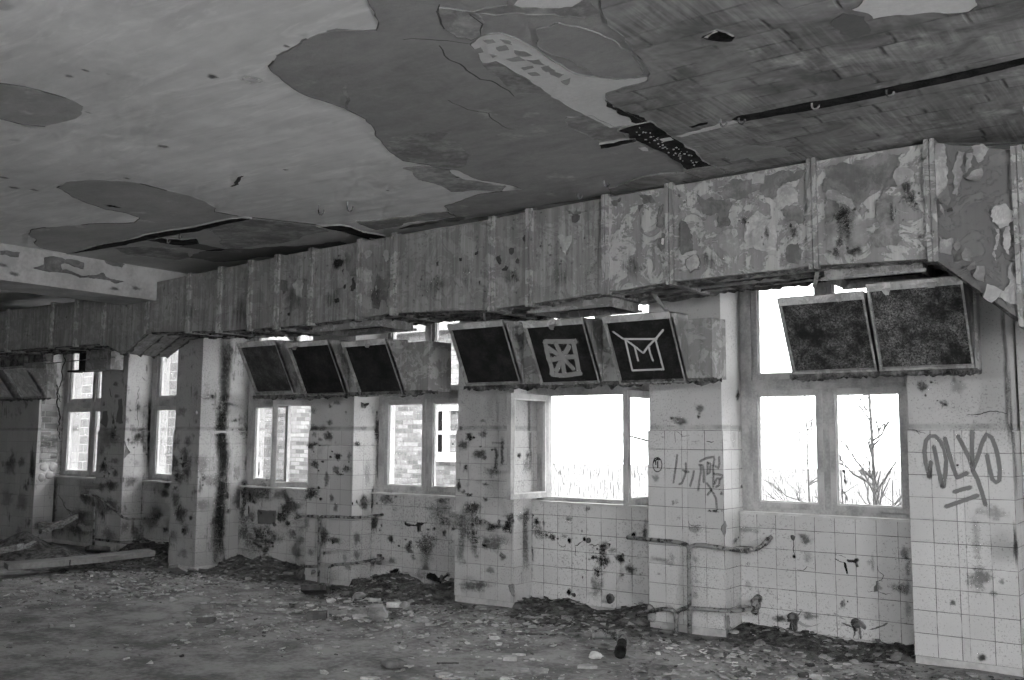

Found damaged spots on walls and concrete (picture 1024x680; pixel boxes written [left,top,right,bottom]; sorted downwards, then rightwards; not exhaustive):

peeling [514,0,582,8]
crack [403,4,514,96]
peeling [638,195,665,255]
peeling [752,173,764,184]
peeling [744,211,777,256]
peeling [775,184,798,209]
peeling [825,190,870,256]
peeling [893,143,989,216]
peeling [34,256,125,284]
peeling [939,236,1024,305]
water stain [161,342,299,558]
mould [452,427,559,558]